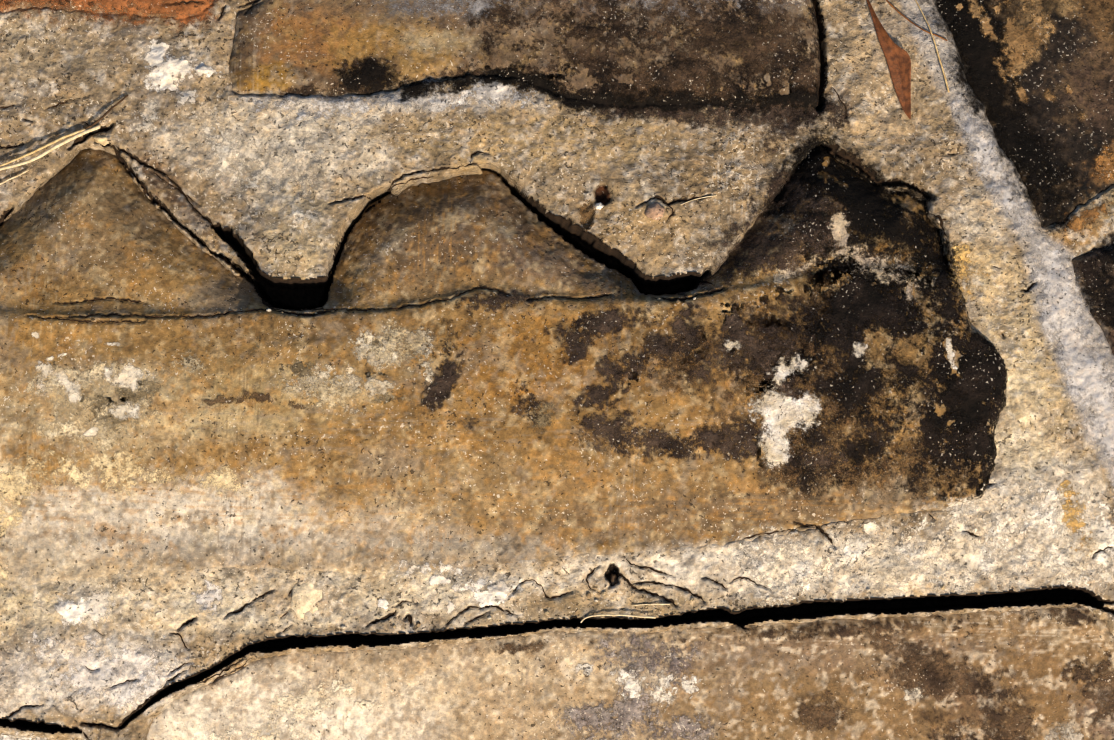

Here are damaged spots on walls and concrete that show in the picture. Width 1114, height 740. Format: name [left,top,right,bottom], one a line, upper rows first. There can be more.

spalling [579,185,610,232]
efflorescence [952,94,1036,230]
water stain [637,234,1114,607]
crack [0,557,1114,739]